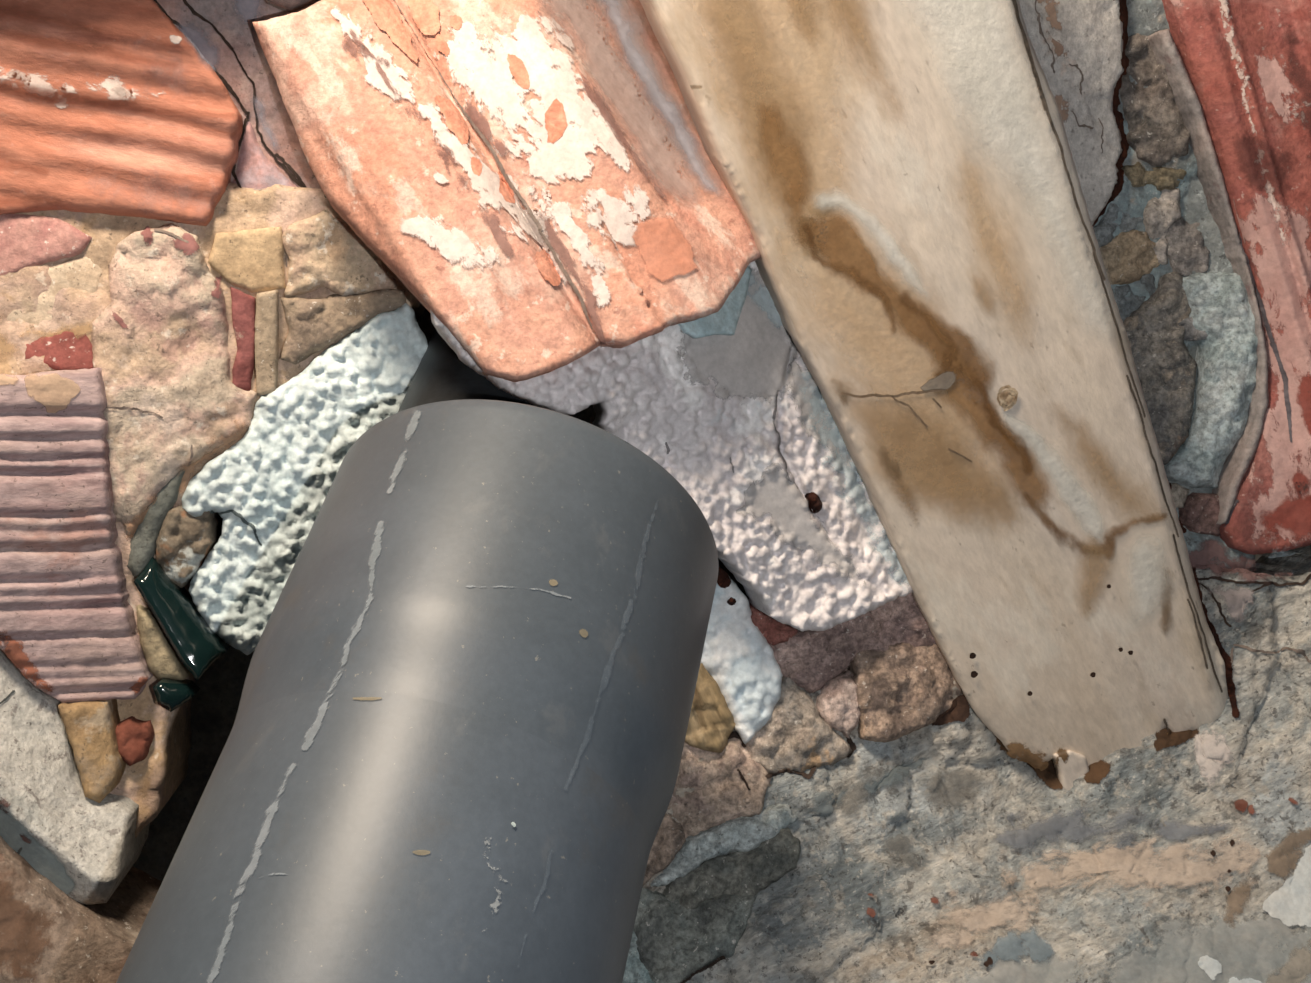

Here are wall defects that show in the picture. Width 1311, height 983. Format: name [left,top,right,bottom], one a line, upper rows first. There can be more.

peeling [331,0,697,308]
peeling [678,266,752,339]
water stain [699,0,1166,599]
peeling [1297,376,1311,435]
peeling [1293,472,1309,497]
water stain [1132,541,1161,614]